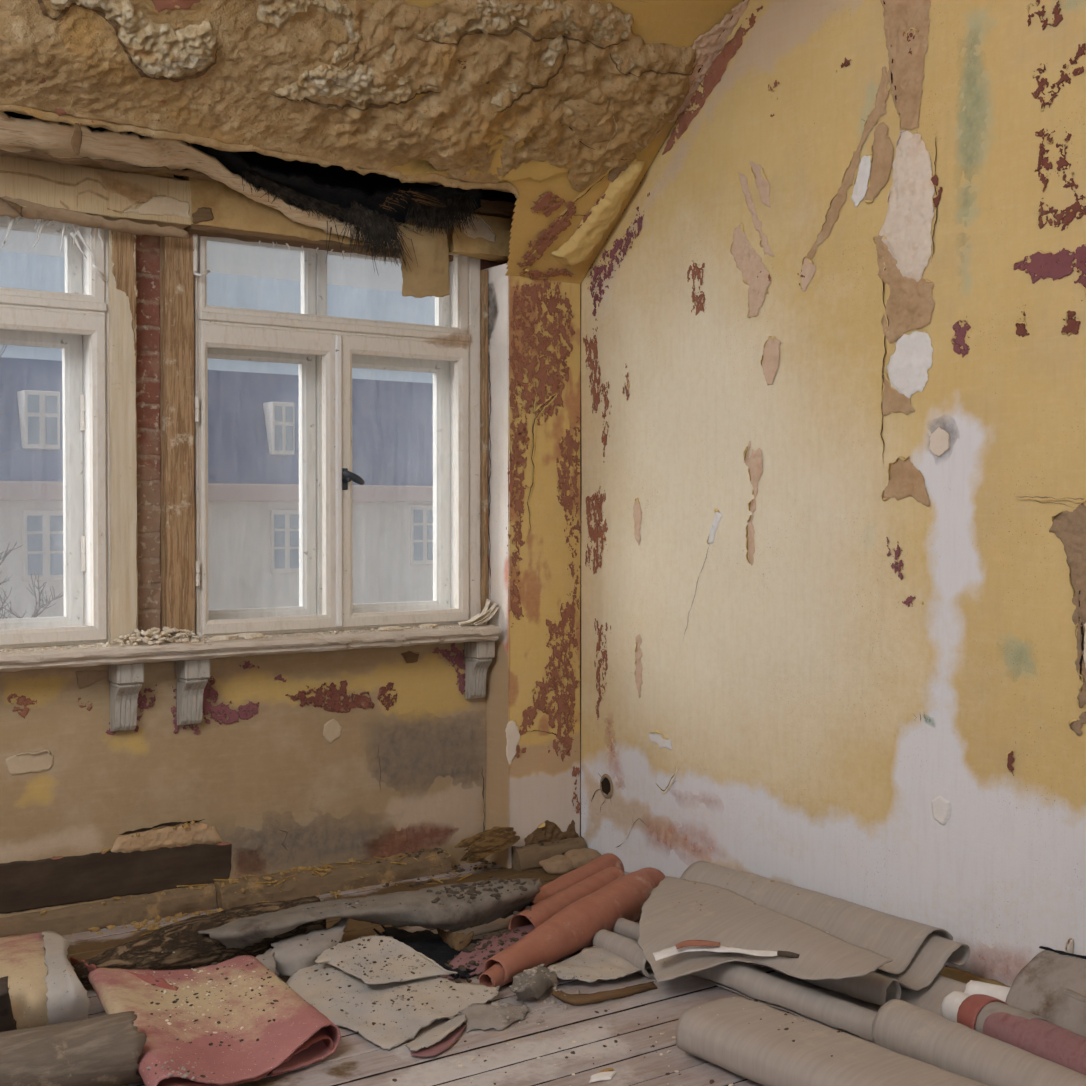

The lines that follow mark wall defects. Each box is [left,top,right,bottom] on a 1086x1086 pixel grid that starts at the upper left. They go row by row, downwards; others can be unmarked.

peeling [1032,43,1086,112]
spalling [798,0,931,292]
peeling [1035,118,1086,231]
spalling [0,0,763,627]
spalling [872,234,935,416]
peeling [950,316,971,358]
peeling [1013,243,1086,337]
spalling [881,456,930,507]
peeling [505,416,608,846]
spalling [1049,498,1086,736]
peeling [274,674,397,713]
spalling [101,819,230,854]